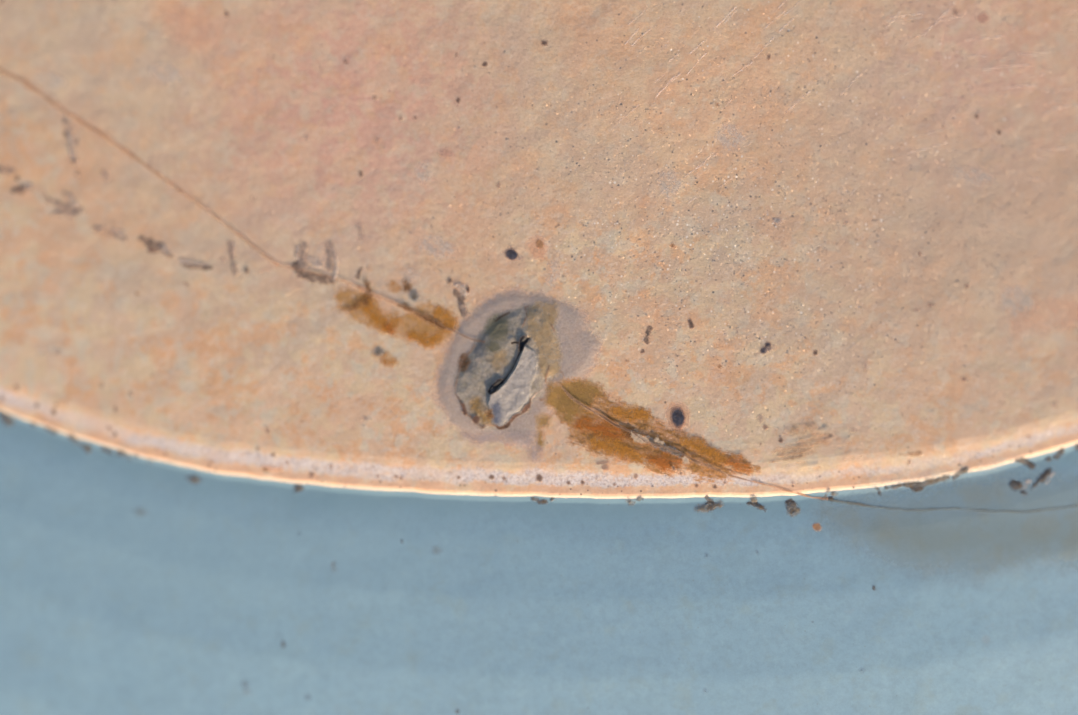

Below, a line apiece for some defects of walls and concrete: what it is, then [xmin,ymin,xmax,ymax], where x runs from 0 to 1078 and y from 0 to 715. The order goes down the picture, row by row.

crack [0,69,422,317]
rust [335,275,458,348]
rust [537,377,761,483]
crack [445,306,1078,513]